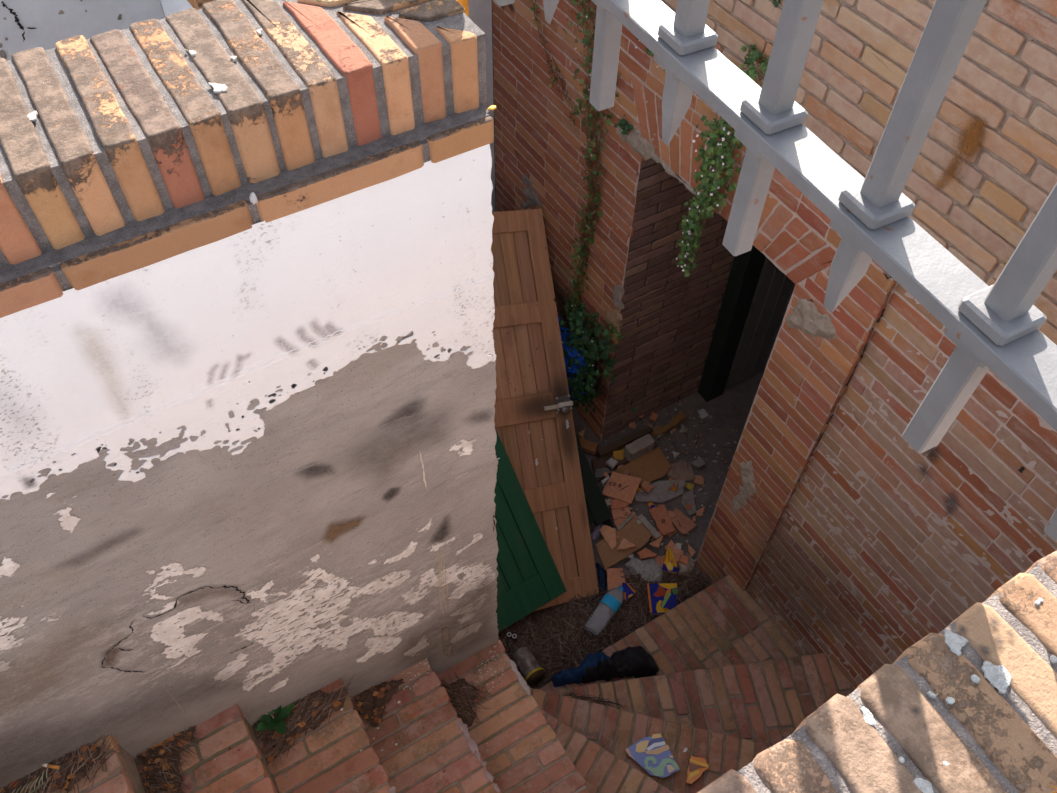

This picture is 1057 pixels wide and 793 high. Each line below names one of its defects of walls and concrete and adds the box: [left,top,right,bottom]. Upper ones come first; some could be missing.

rust [937,119,984,187]
spalling [785,298,838,340]
crack [798,309,885,483]
peeling [0,331,499,788]
crack [102,585,251,672]